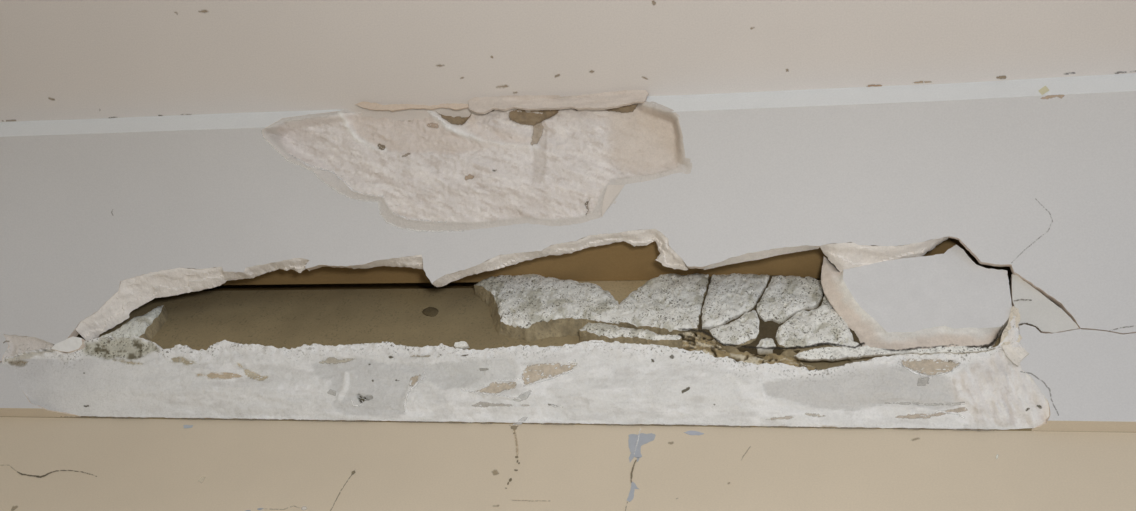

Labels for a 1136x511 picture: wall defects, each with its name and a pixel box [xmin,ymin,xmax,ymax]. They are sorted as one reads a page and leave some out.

flaking render [3,90,1049,510]
crack [682,299,1042,351]
crack [18,470,97,478]